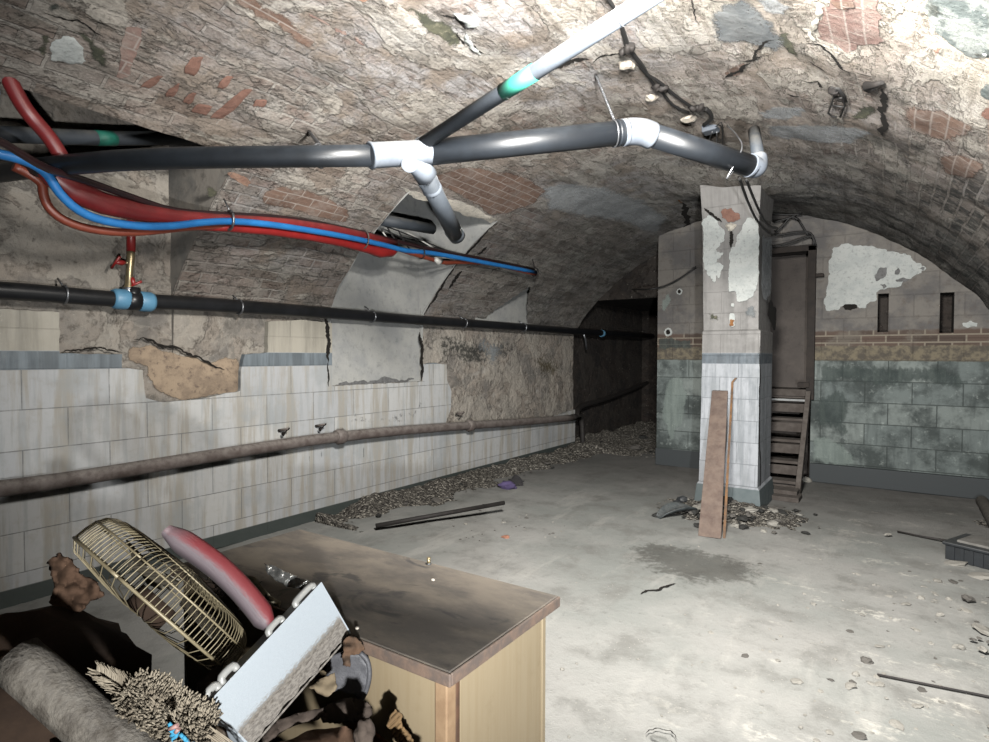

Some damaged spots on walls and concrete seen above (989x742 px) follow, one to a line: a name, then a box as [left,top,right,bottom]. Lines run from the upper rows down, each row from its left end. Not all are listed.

peeling [50,36,85,64]
crack [725,40,774,78]
flaking render [808,0,884,53]
flaking render [924,0,989,58]
flaking render [905,106,971,141]
peeling [702,208,777,330]
peeling [824,243,926,311]
crack [325,224,495,386]
crack [61,337,224,370]
flaking render [128,345,239,400]
damp [822,366,961,387]
damp [819,392,847,432]